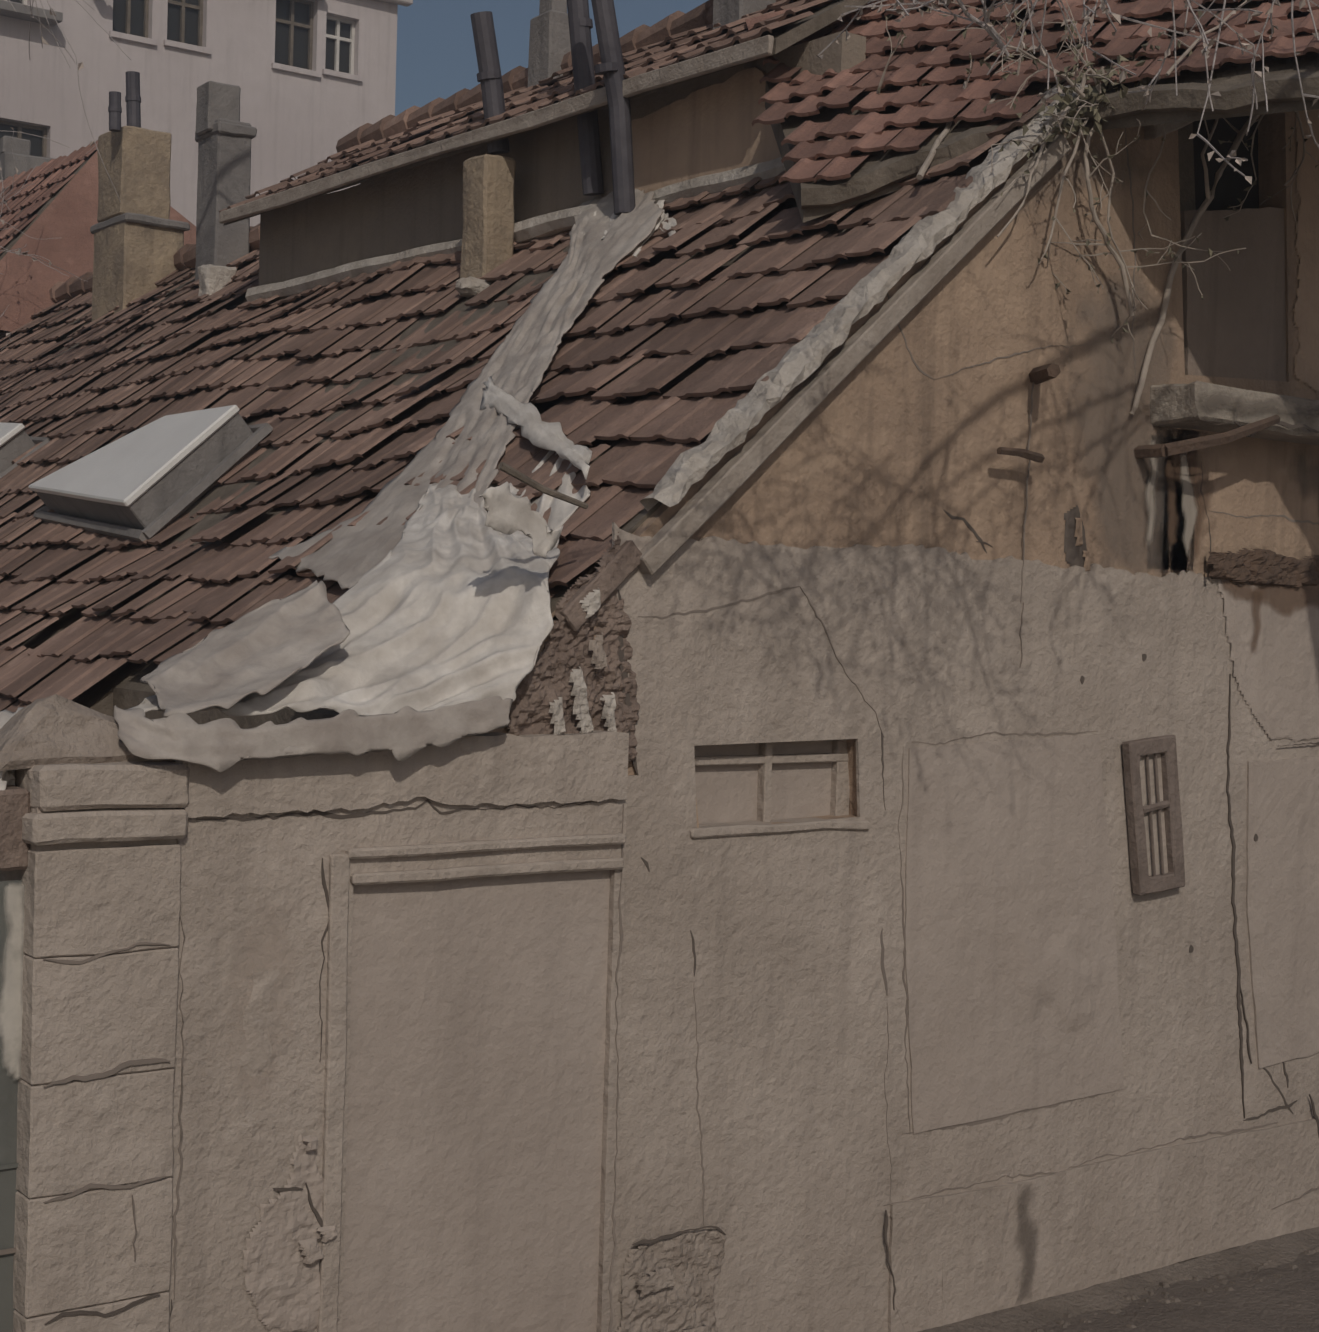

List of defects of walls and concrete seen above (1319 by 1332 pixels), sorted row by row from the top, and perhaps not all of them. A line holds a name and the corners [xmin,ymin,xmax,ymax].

spalling [506,532,640,761]
crack [43,916,185,1332]
crack [179,799,726,1332]
crack [618,586,1319,1310]